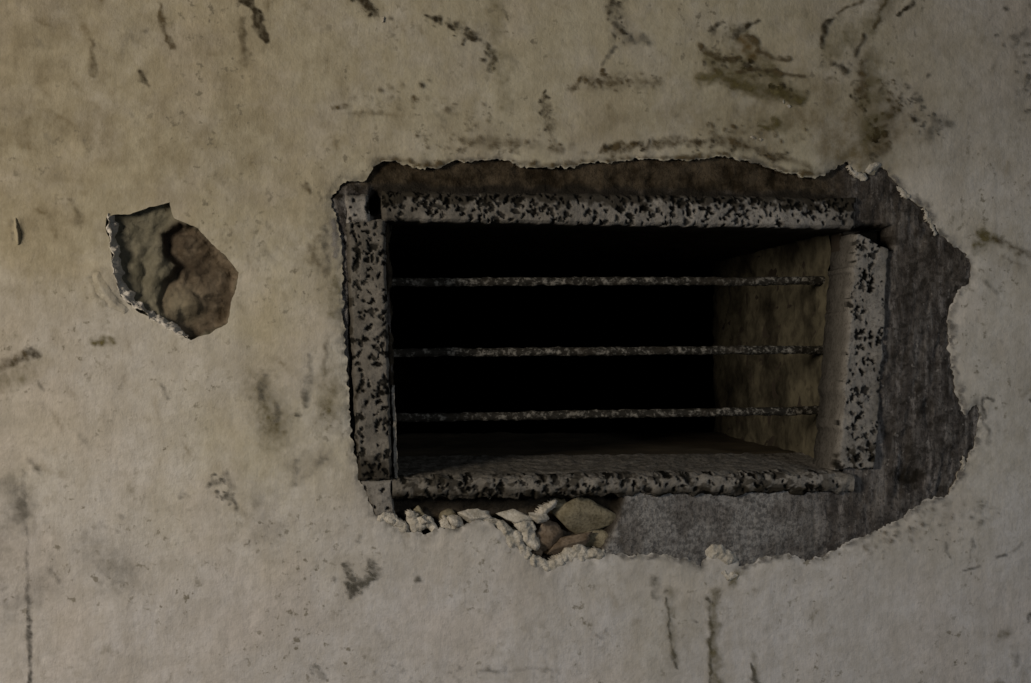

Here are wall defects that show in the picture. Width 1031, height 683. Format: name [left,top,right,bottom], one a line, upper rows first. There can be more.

water stain [351,0,384,23]
water stain [425,15,497,69]
water stain [600,140,678,157]
water stain [696,137,788,161]
spalling [105,203,239,340]
flaking render [330,152,982,581]